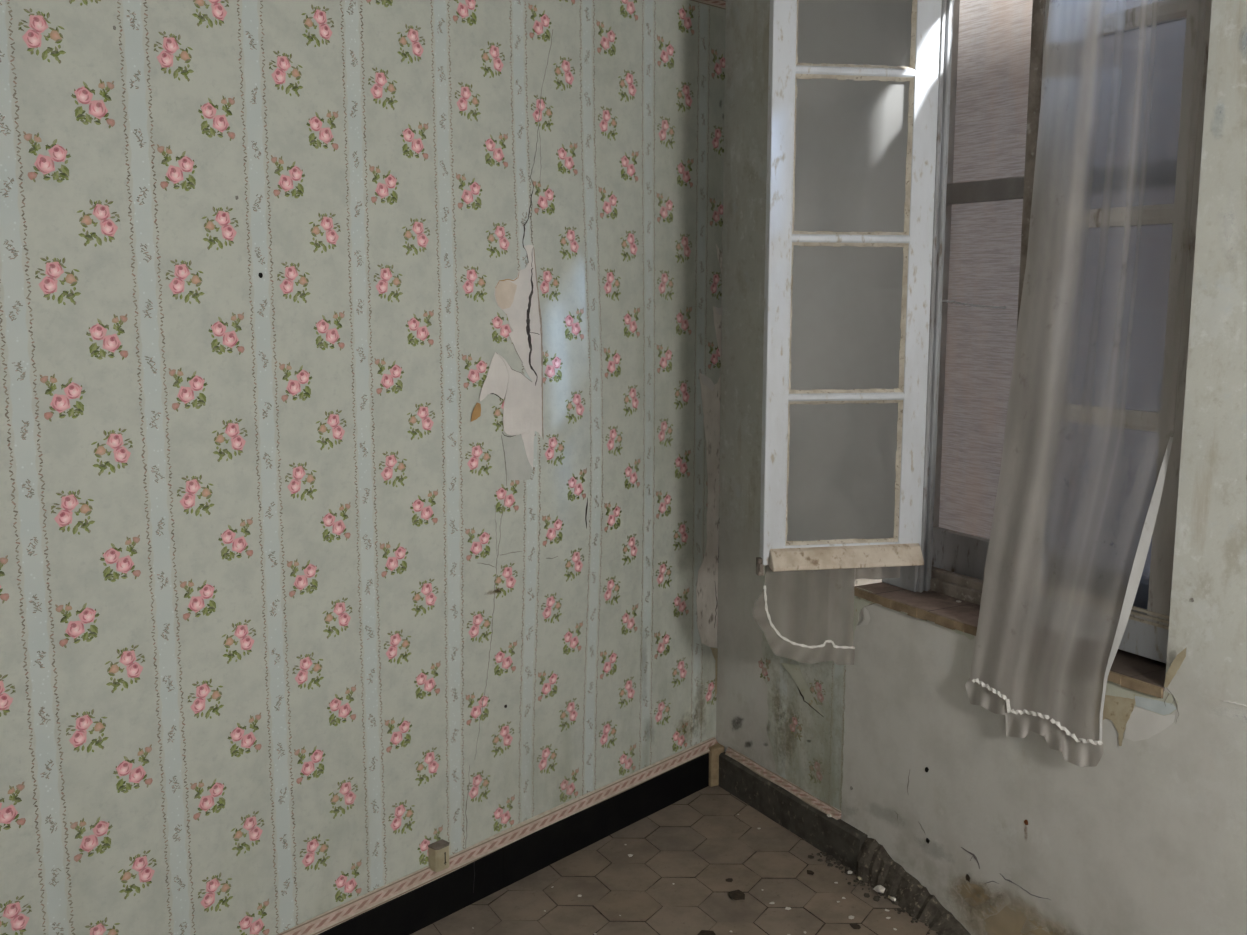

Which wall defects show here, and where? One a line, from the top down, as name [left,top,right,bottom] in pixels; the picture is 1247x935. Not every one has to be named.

crack [522,30,553,386]
peeling [471,403,481,422]